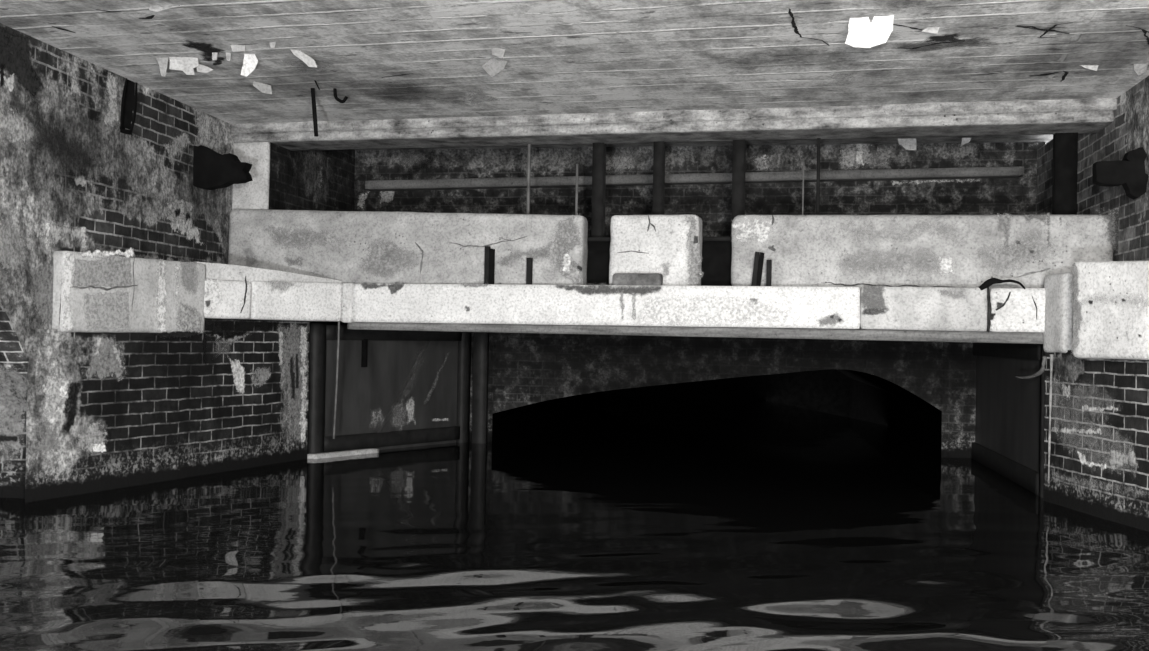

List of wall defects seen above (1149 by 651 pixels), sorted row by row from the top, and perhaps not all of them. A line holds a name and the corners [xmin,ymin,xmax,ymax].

peeling [149,4,180,12]
peeling [156,41,272,94]
peeling [290,49,317,67]
crack [788,9,830,46]
peeling [845,15,894,48]
crack [1125,25,1149,45]
water stain [0,26,102,186]
water stain [104,73,119,125]
spalling [120,78,137,135]
water stain [166,133,190,158]
water stain [0,216,134,330]
water stain [0,337,125,454]